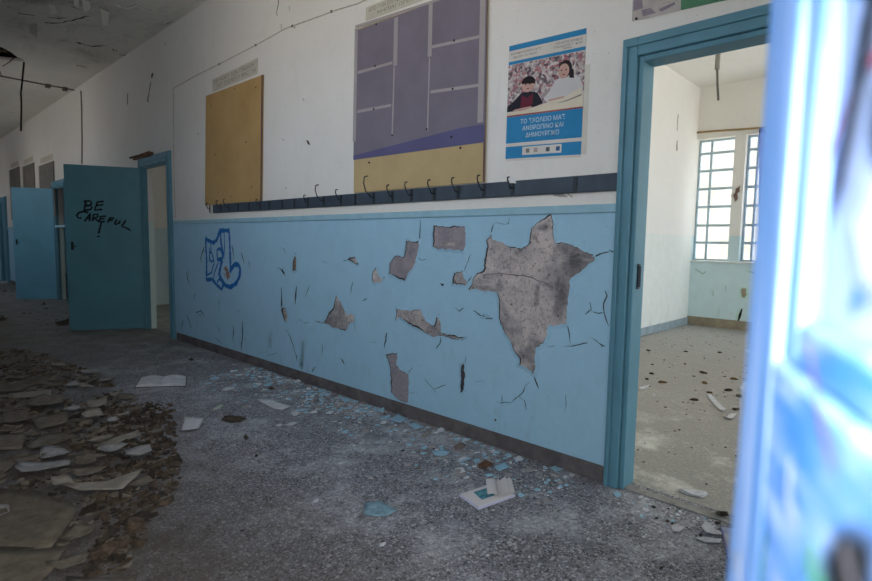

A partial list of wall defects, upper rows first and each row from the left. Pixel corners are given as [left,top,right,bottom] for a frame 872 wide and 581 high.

peeling [314,293,356,332]
peeling [371,214,614,394]
crack [485,273,564,294]
crack [564,290,609,347]
peeling [385,351,417,404]
crack [496,384,526,410]